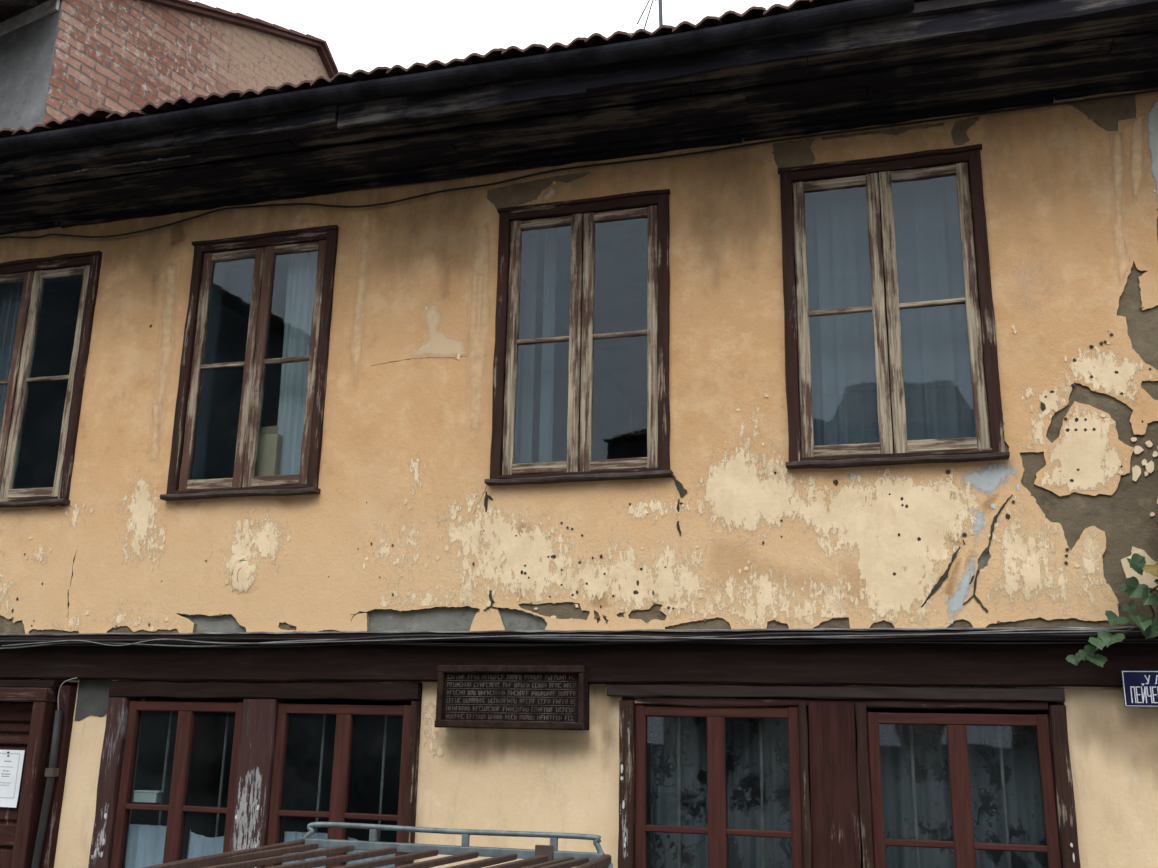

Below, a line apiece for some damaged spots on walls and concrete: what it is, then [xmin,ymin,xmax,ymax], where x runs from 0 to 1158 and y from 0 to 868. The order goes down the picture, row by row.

flaking render [772,138,815,168]
flaking render [951,117,979,146]
flaking render [1069,93,1158,241]
peeling [357,263,1158,631]
peeling [116,467,167,570]
peeling [205,505,291,591]
crack [672,475,687,536]
crack [921,495,1013,612]
flaking render [0,571,246,634]
peeling [233,766,264,851]